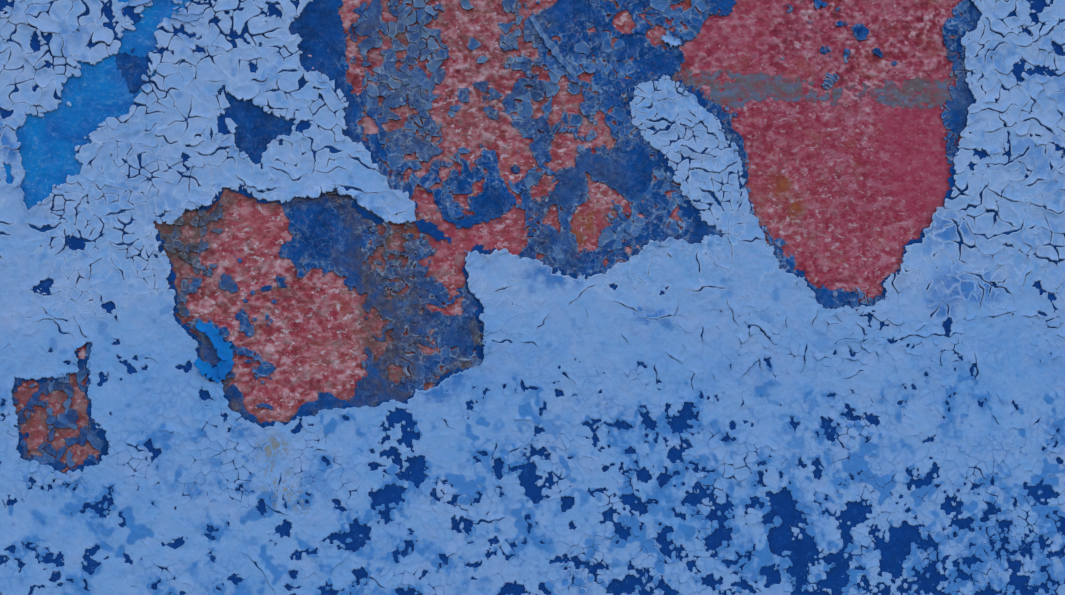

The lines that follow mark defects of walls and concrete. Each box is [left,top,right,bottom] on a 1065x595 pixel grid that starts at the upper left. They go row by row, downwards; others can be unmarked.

crack [978,17,1065,81]
crack [0,194,138,303]
peeling [0,0,262,230]
crack [185,129,380,194]
peeling [144,0,999,580]
crack [646,103,744,211]
crack [696,254,786,375]
crack [961,96,1065,318]
peeling [0,330,148,491]
spalling [71,486,127,528]
spalling [546,391,1065,595]
spalling [0,541,109,595]